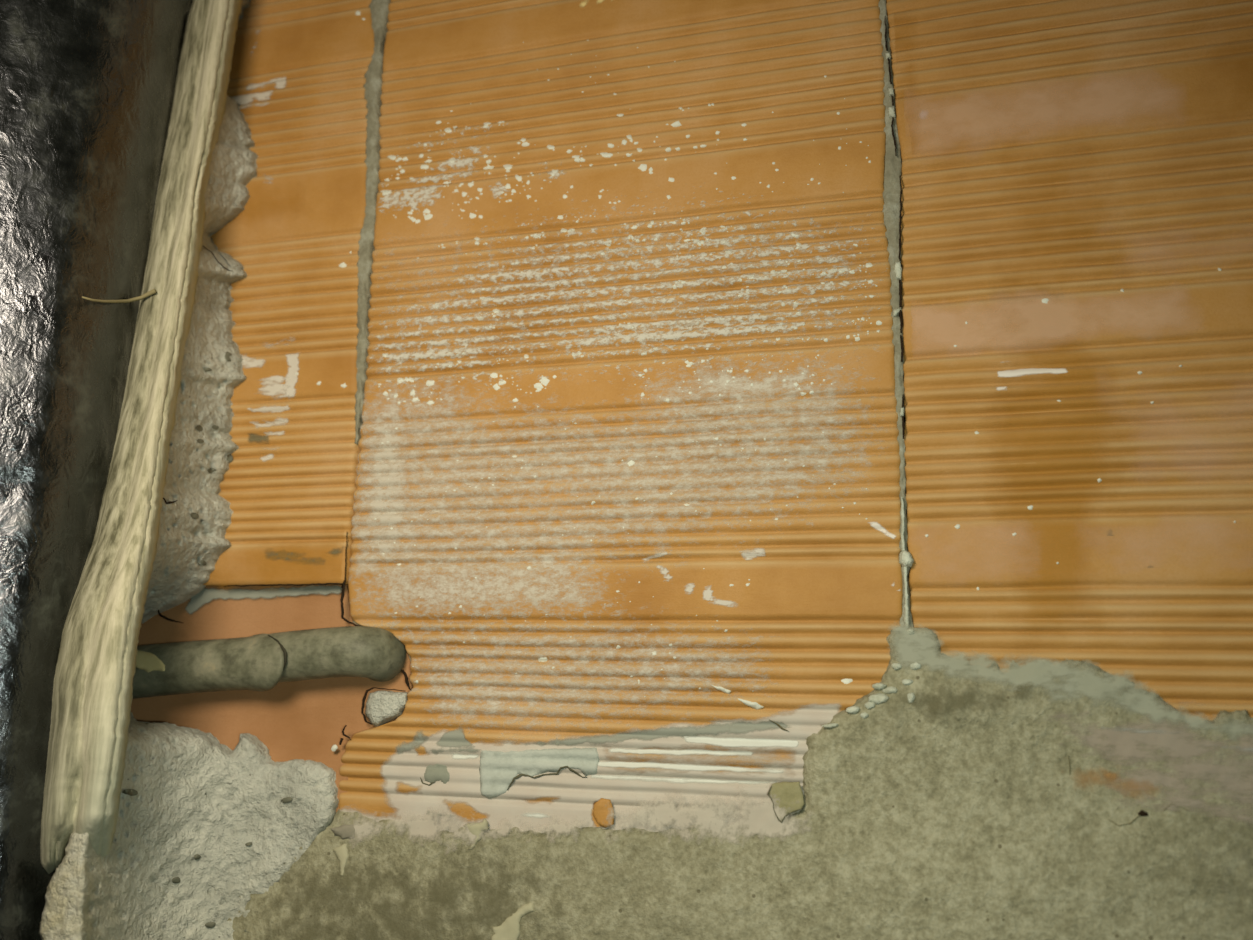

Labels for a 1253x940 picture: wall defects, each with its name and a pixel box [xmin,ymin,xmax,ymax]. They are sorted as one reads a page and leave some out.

water stain [379,125,492,212]
crack [885,16,904,362]
crack [899,394,907,439]
water stain [352,201,874,725]
water stain [268,550,340,563]
spalling [136,585,359,673]
peeling [131,652,840,876]